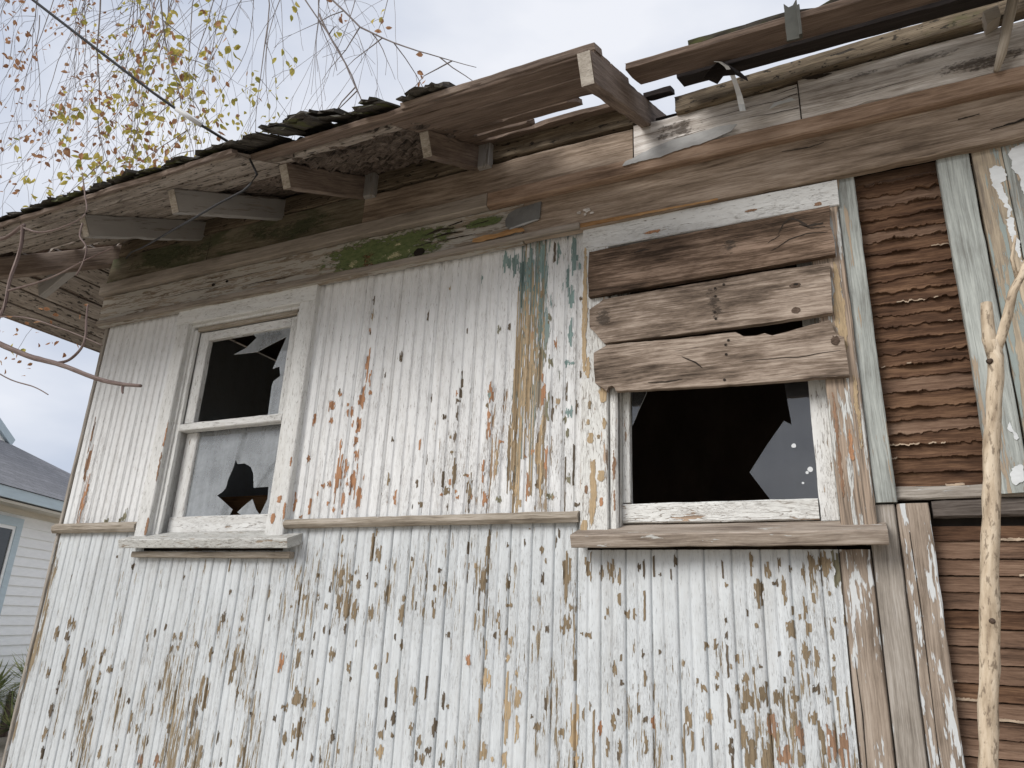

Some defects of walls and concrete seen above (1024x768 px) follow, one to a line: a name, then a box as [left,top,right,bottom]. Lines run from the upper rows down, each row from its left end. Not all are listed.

crack [768,217,825,250]
peeling [270,348,386,524]
peeling [440,237,616,530]
peeling [40,615,76,759]
peeling [272,686,340,759]
peeling [290,528,387,647]
peeling [373,595,417,761]
peeling [408,691,449,768]
peeling [467,529,541,768]
peeling [533,528,592,639]
peeling [558,695,622,768]
peeling [671,550,851,768]